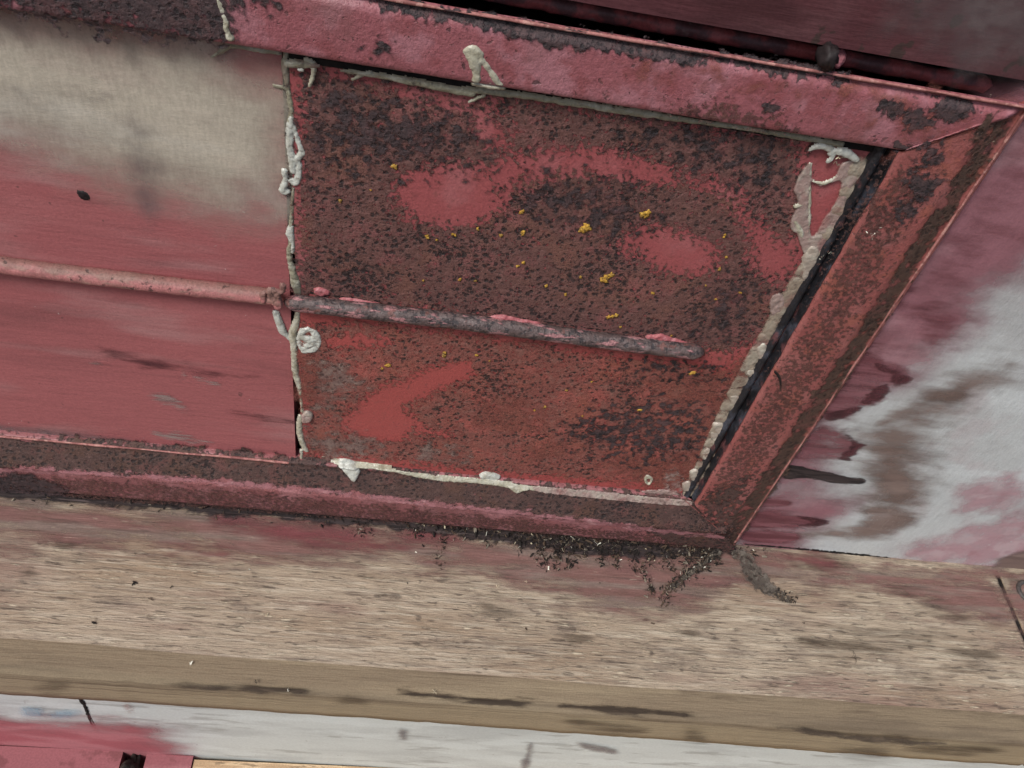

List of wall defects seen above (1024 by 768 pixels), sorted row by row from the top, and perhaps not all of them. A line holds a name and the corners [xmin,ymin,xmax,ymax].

rust [0,0,282,49]
rust [358,35,395,60]
rust [0,66,975,553]
water stain [741,363,994,543]
water stain [995,551,1024,569]